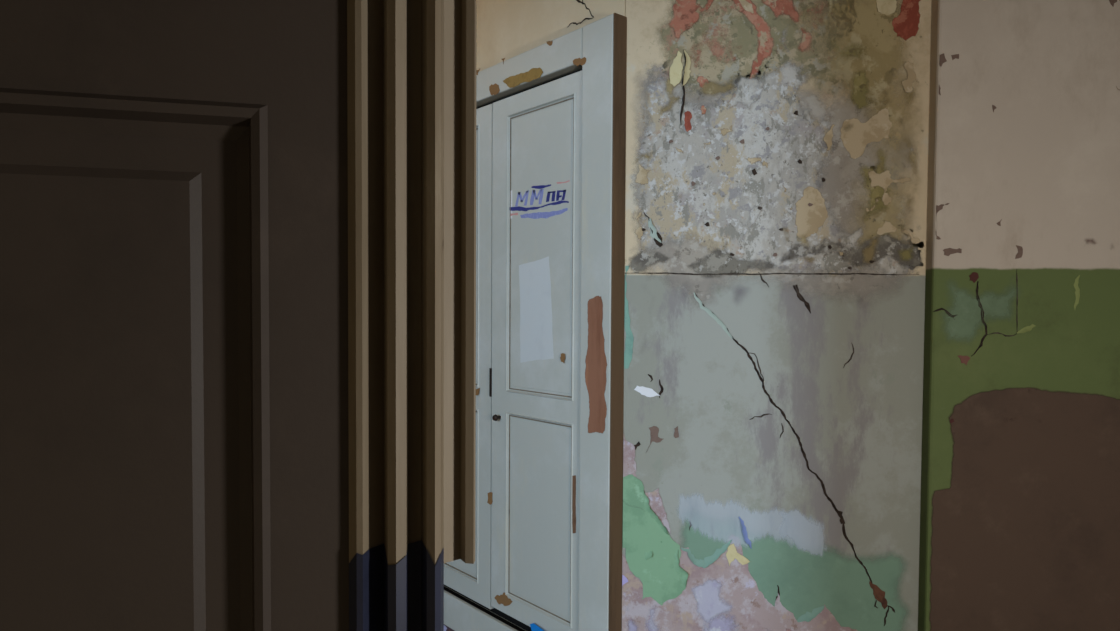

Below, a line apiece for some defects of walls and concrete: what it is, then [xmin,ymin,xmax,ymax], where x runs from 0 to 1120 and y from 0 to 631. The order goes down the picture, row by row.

crack [568,0,594,27]
peeling [633,0,921,301]
flaking render [936,232,962,256]
crack [933,275,1035,357]
peeling [622,426,906,631]
crack [635,272,918,626]
peeling [930,388,1120,631]